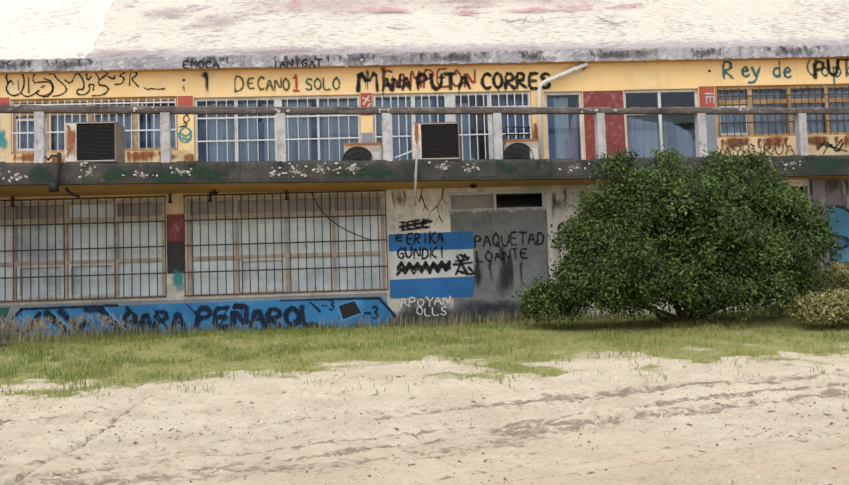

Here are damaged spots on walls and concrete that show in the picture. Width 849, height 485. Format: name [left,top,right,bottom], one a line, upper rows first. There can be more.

rust [52,125,75,162]
water stain [500,248,523,280]